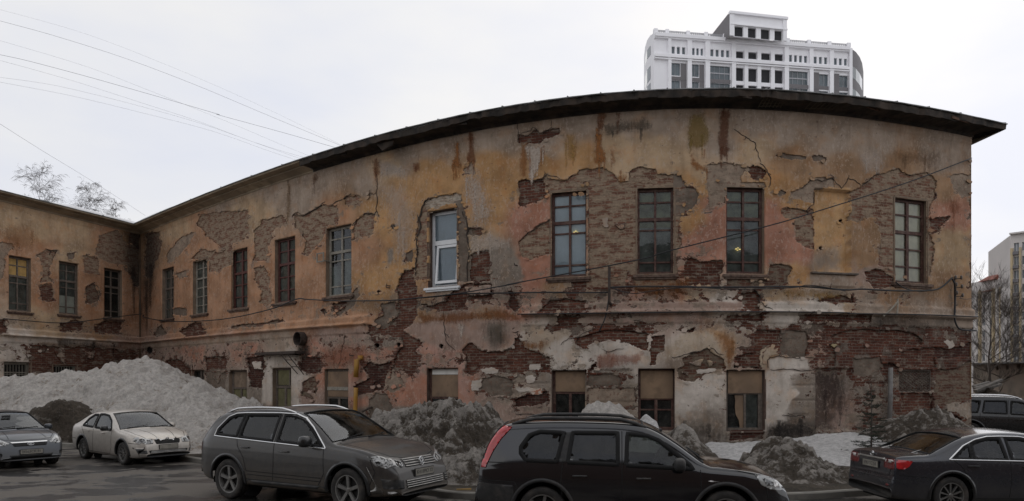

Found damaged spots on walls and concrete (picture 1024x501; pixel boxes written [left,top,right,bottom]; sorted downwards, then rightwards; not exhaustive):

corrosion [452,132,475,179]
water stain [688,115,708,149]
crack [734,129,771,185]
flaking render [949,159,972,206]
flaking render [37,192,375,307]
flaking render [517,160,834,325]
flaking render [836,169,949,288]
flaking render [27,306,206,373]
flaking render [354,193,493,418]
flaking render [459,338,550,407]
flaking render [576,330,665,365]
flaking render [852,342,970,420]